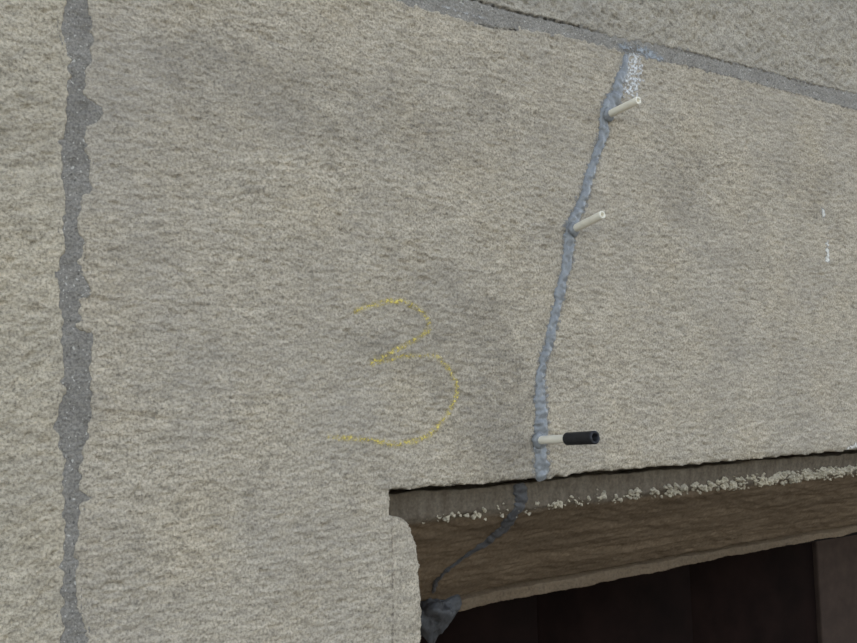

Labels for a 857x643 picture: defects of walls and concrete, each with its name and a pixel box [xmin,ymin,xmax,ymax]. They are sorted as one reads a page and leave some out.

crack [473,0,580,31]
crack [432,43,848,593]